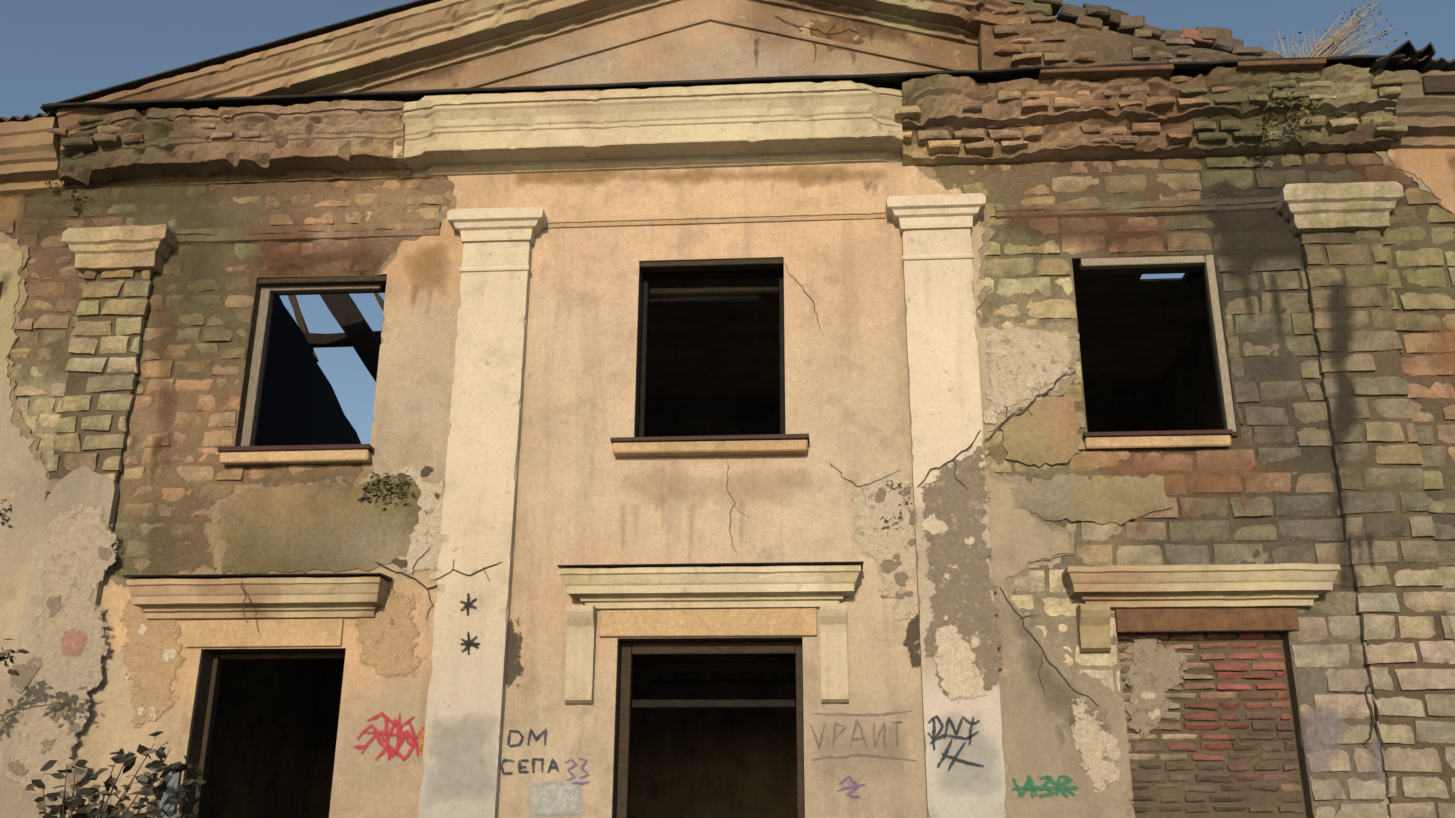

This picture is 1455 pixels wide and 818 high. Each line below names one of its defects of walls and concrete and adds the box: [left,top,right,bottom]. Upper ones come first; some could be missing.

crack [784,262,821,331]
leakage [1330,282,1357,450]
spalling [0,176,457,800]
crack [375,548,502,619]
crack [726,462,750,552]
crack [830,370,1076,499]
spalling [851,151,1455,818]
leakage [1342,534,1374,581]